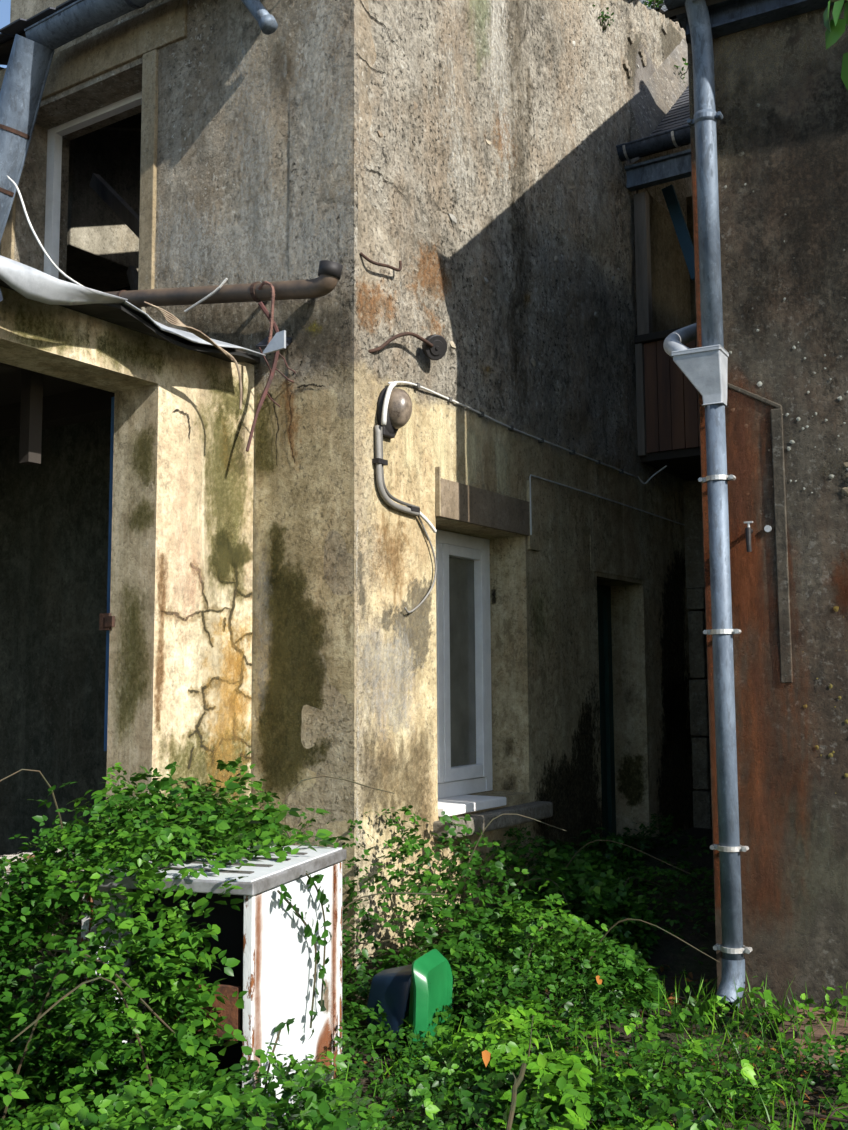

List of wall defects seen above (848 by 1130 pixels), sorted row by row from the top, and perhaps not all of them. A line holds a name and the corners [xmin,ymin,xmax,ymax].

damp [206,379,251,579]
corrosion [726,393,760,616]
crack [161,538,253,780]
damp [171,737,246,807]
damp [259,526,324,787]
damp [534,683,603,858]
damp [657,551,695,837]